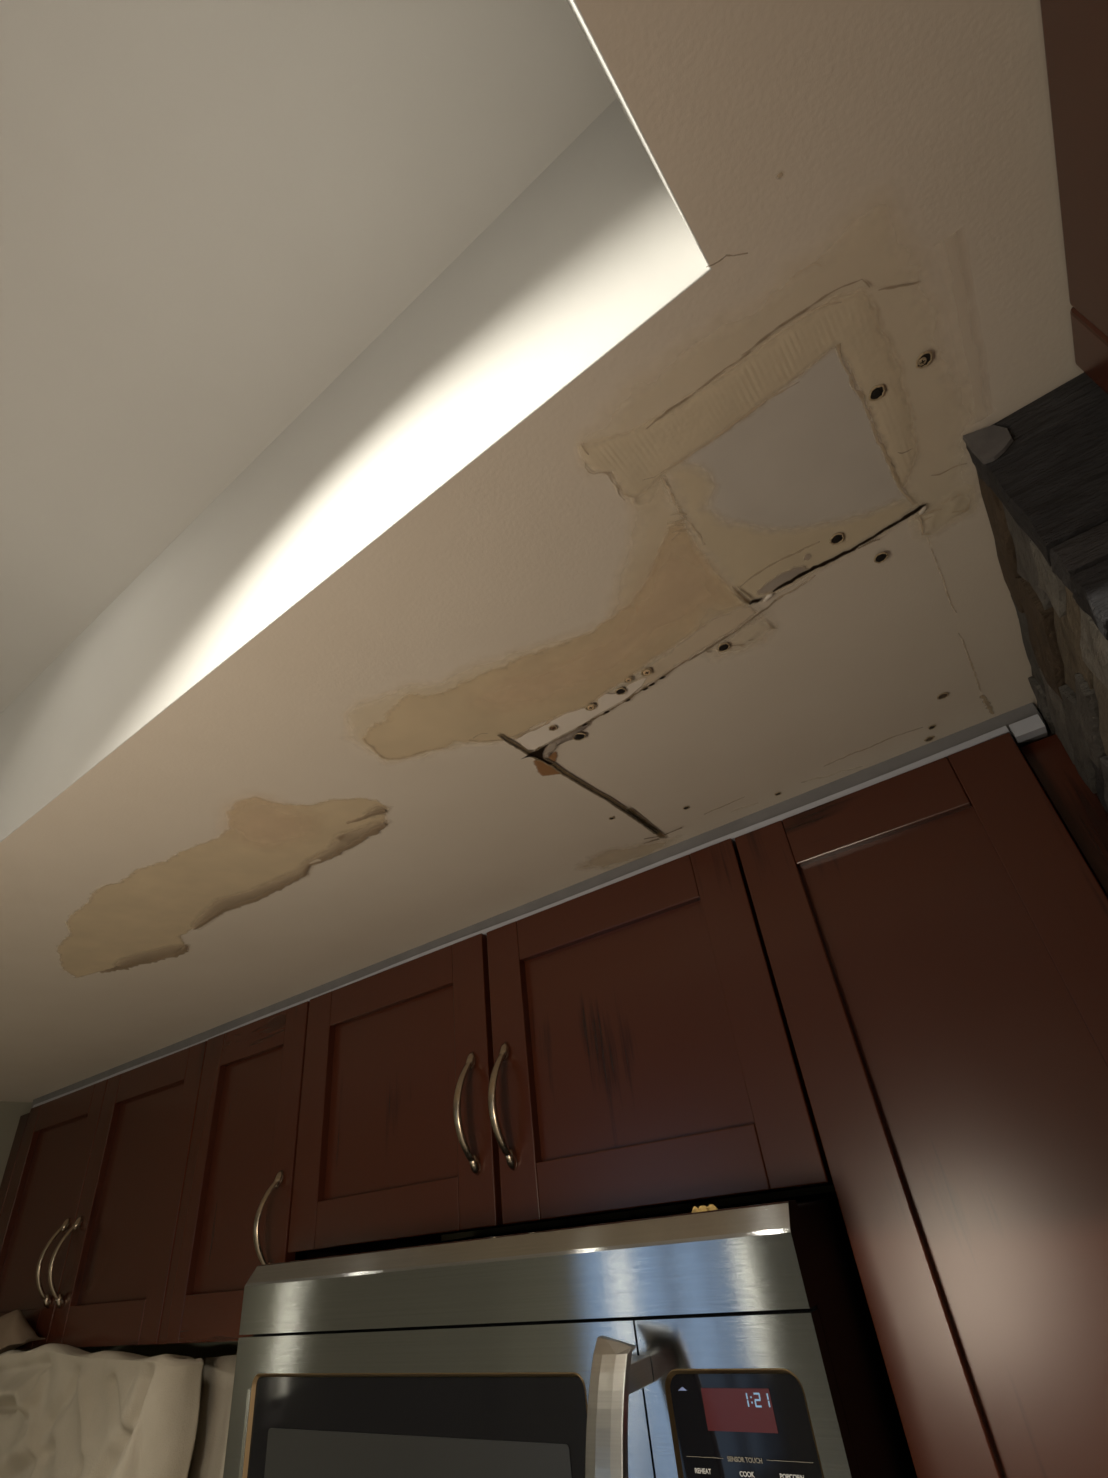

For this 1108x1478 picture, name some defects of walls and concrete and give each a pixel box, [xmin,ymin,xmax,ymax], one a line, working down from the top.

spalling [512,608,754,750]
crack [497,444,994,844]
peeling [194,807,387,930]
peeling [100,946,188,973]